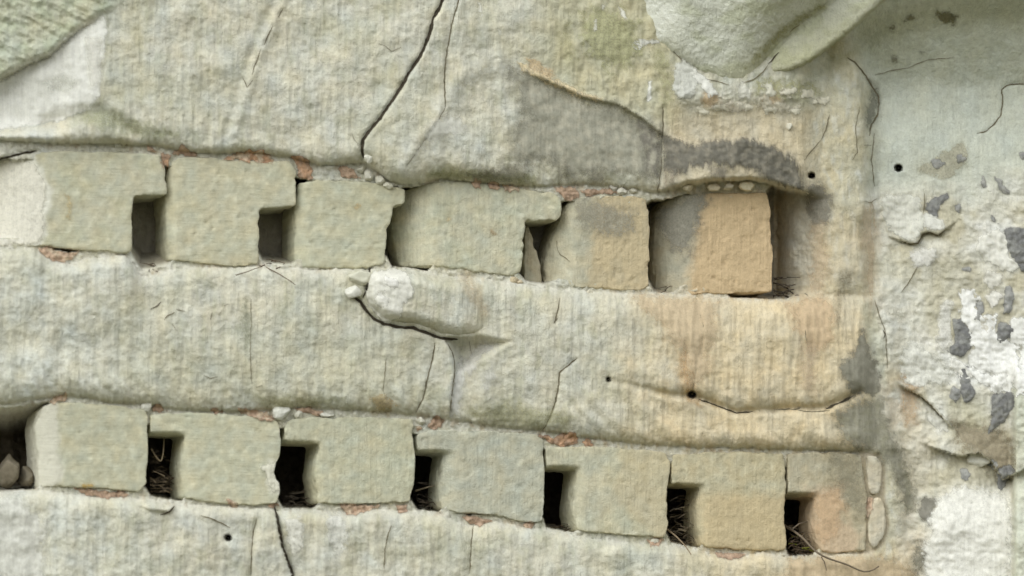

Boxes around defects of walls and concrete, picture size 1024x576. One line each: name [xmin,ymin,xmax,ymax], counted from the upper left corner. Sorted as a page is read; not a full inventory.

crack [352,0,459,167]
leakage [425,64,833,225]
crack [848,57,955,211]
spalling [880,193,945,267]
spalling [919,143,968,179]
crack [977,83,1024,134]
crack [355,268,472,412]
crack [543,358,577,429]
crack [692,382,853,414]
leakage [829,328,936,523]
spalling [899,229,1024,398]
crack [200,507,294,576]